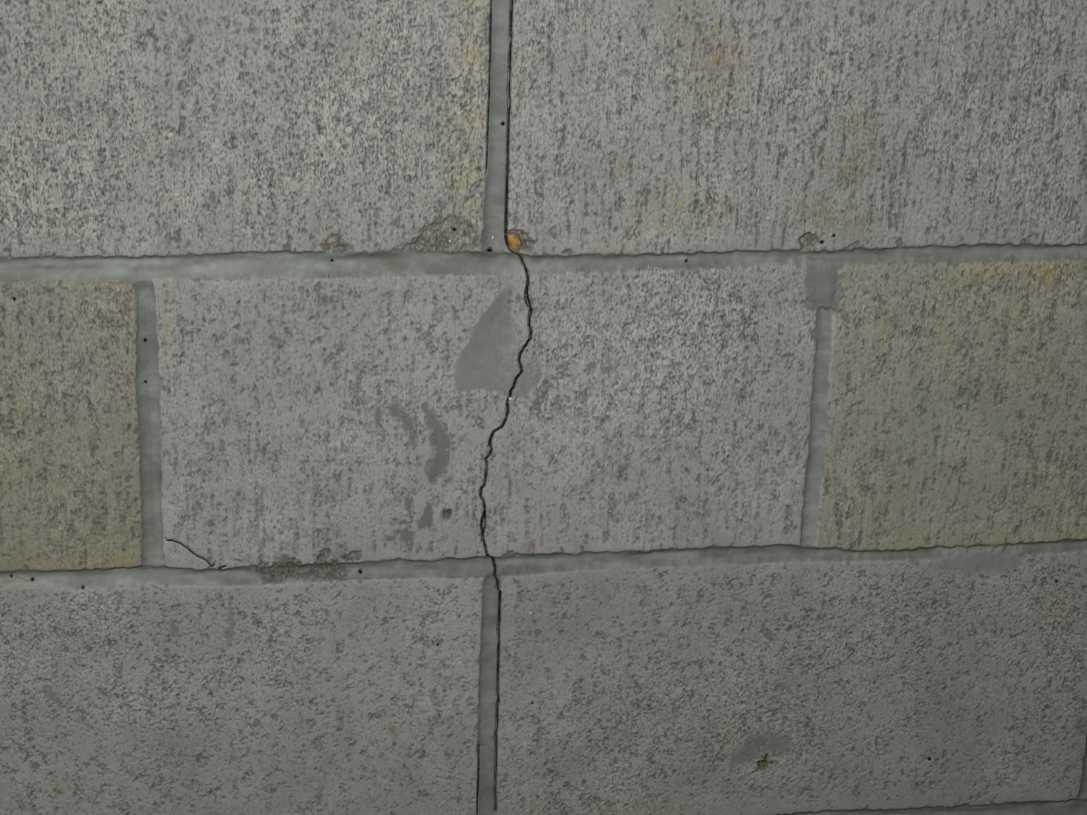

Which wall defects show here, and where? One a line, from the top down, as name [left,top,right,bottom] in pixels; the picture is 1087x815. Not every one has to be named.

crack [477,0,532,815]